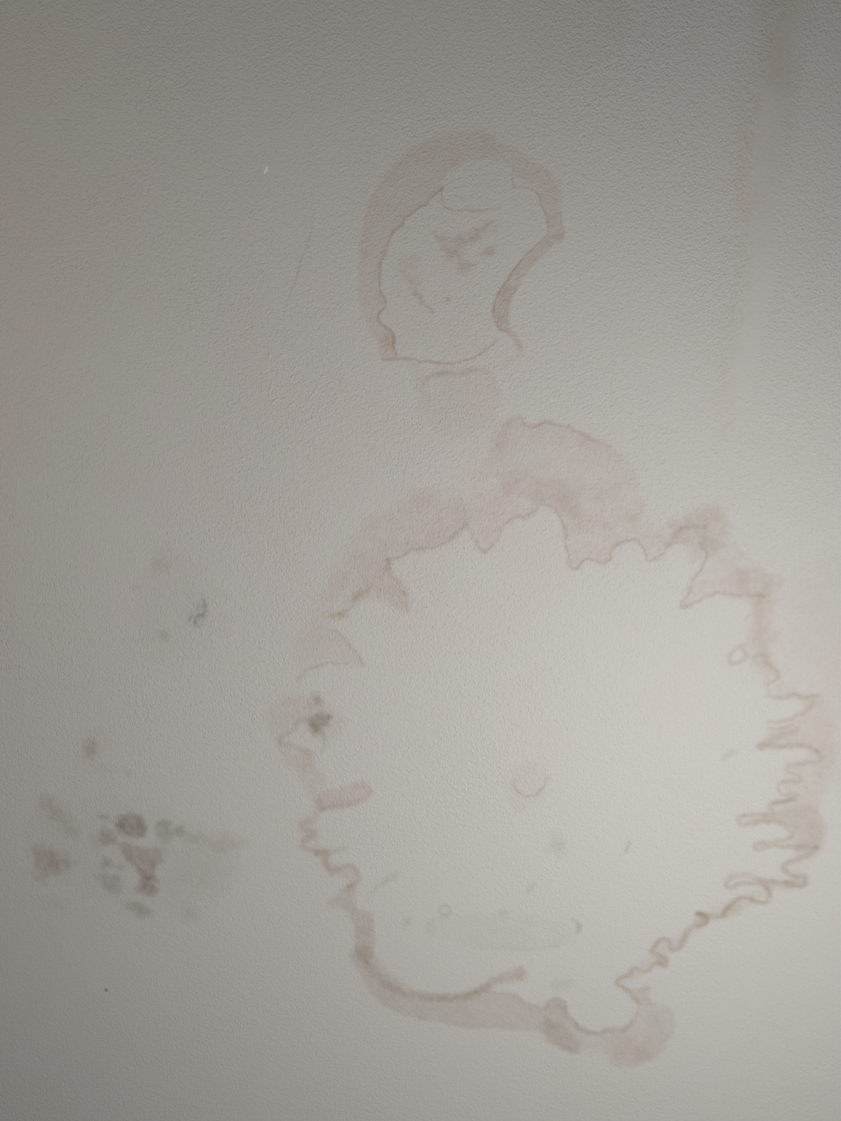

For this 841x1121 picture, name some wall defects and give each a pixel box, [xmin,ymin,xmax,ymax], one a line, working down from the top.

water stain [21,792,252,926]
water stain [259,126,841,1070]